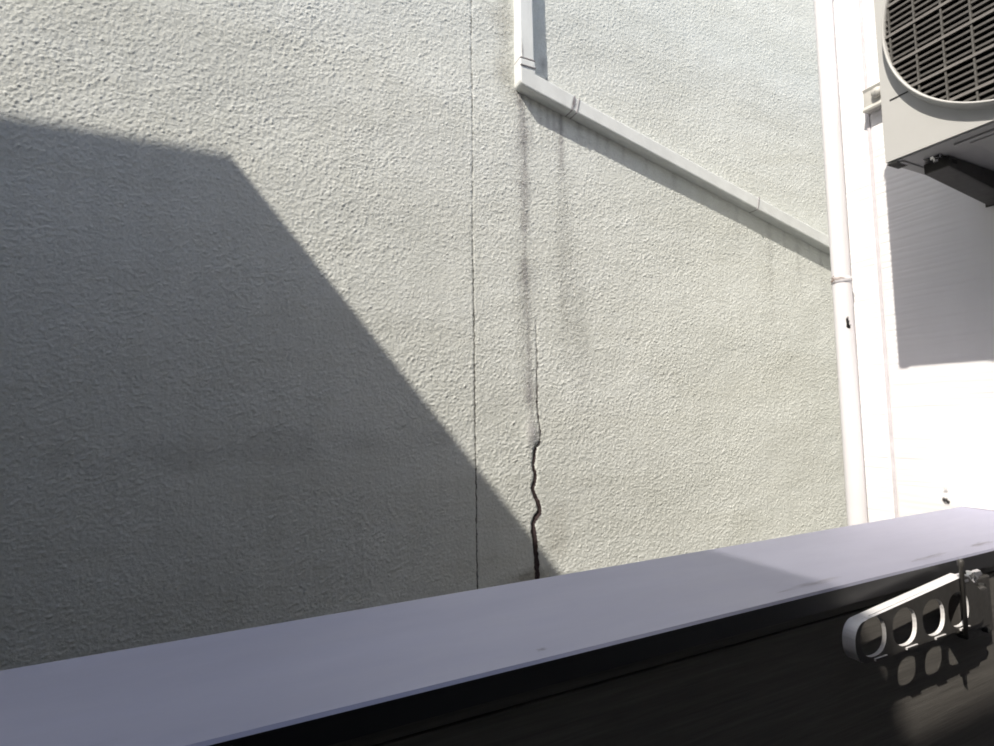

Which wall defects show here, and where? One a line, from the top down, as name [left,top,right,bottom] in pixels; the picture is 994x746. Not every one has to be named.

crack [531,348,542,579]